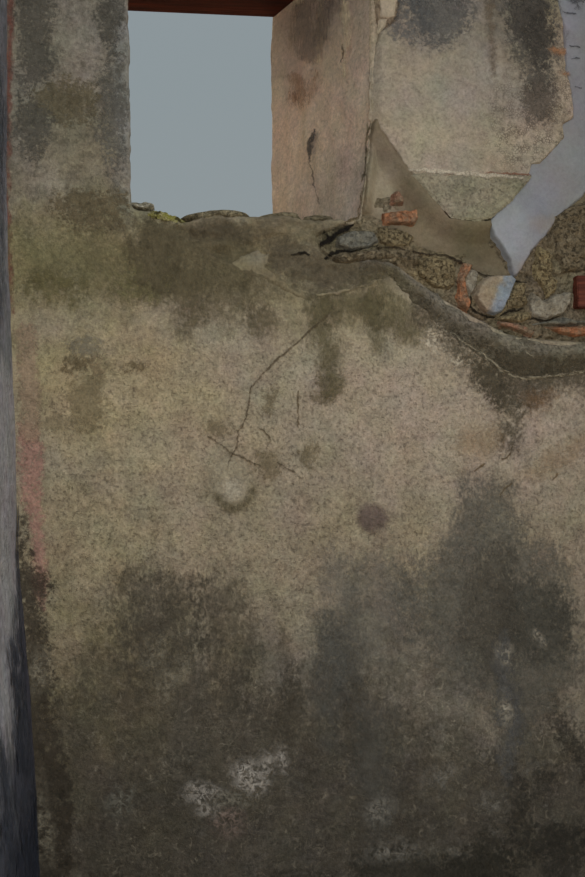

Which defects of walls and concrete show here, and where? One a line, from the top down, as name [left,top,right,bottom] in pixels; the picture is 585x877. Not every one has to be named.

water stain [0,0,131,324]
crack [209,315,328,478]
water stain [130,217,585,451]
peeling [374,0,399,34]
water stain [388,0,476,47]
spalling [317,124,585,342]
water stain [485,0,561,126]
water stain [0,506,76,877]
efflorescence [192,752,287,838]
water stain [354,478,585,877]